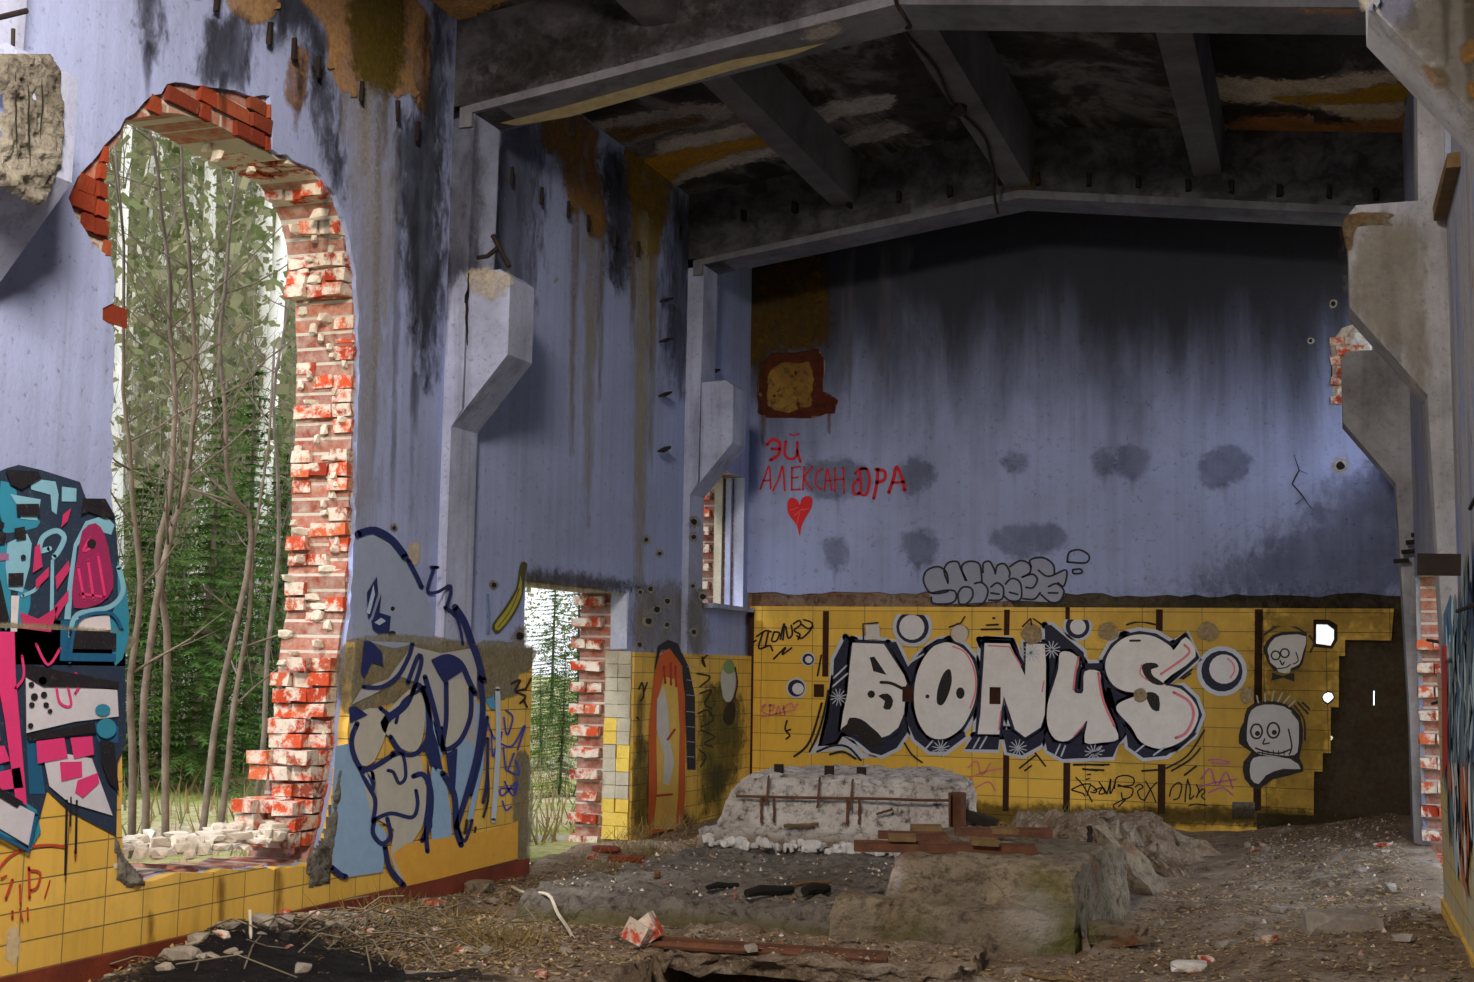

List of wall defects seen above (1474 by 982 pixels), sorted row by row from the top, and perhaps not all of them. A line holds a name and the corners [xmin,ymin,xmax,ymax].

spalling [0,54,65,205]
peeling [146,0,511,151]
water stain [815,95,909,146]
peeling [1224,112,1405,133]
flaking render [69,146,112,256]
water stain [353,92,386,417]
flaking render [103,304,127,329]
rust [541,114,769,517]
spalling [758,349,838,418]
crack [1292,455,1313,510]
peeling [0,623,136,652]
spalling [306,770,342,888]